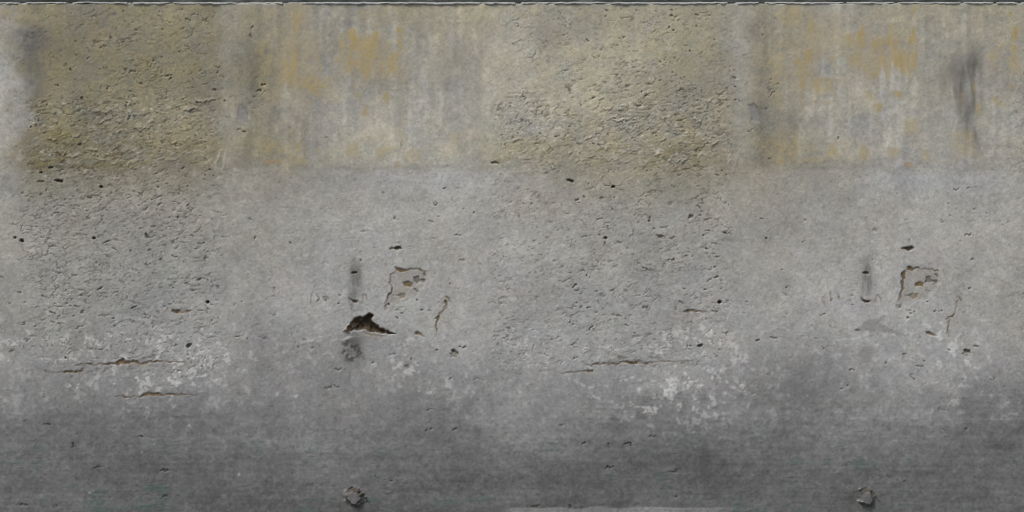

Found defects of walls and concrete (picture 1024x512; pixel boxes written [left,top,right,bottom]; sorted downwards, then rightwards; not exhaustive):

leakage [5,4,63,163]
leakage [923,31,987,162]
spalling [342,265,430,339]
spalling [895,265,943,311]
crack [46,358,201,399]
crack [557,358,701,375]